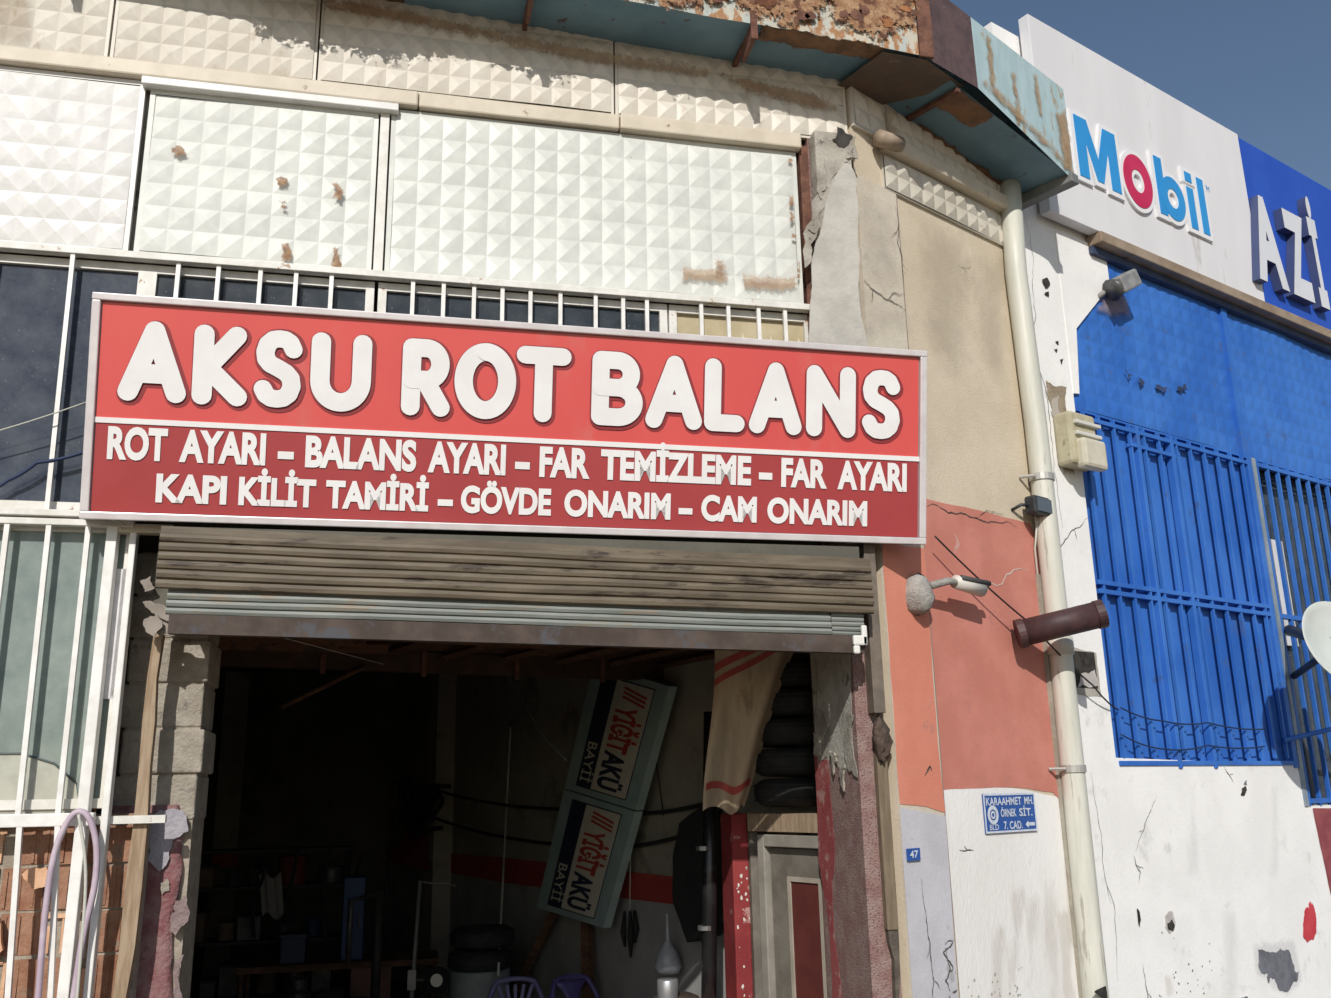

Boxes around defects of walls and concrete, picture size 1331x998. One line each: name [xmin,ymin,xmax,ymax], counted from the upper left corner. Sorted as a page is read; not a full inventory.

corrosion [325,0,837,110]
corrosion [628,0,920,60]
spalling [803,127,858,268]
peeling [148,809,190,936]
spalling [173,955,184,998]
crack [921,879,940,995]
crack [1091,775,1157,997]
peeling [1258,949,1299,992]